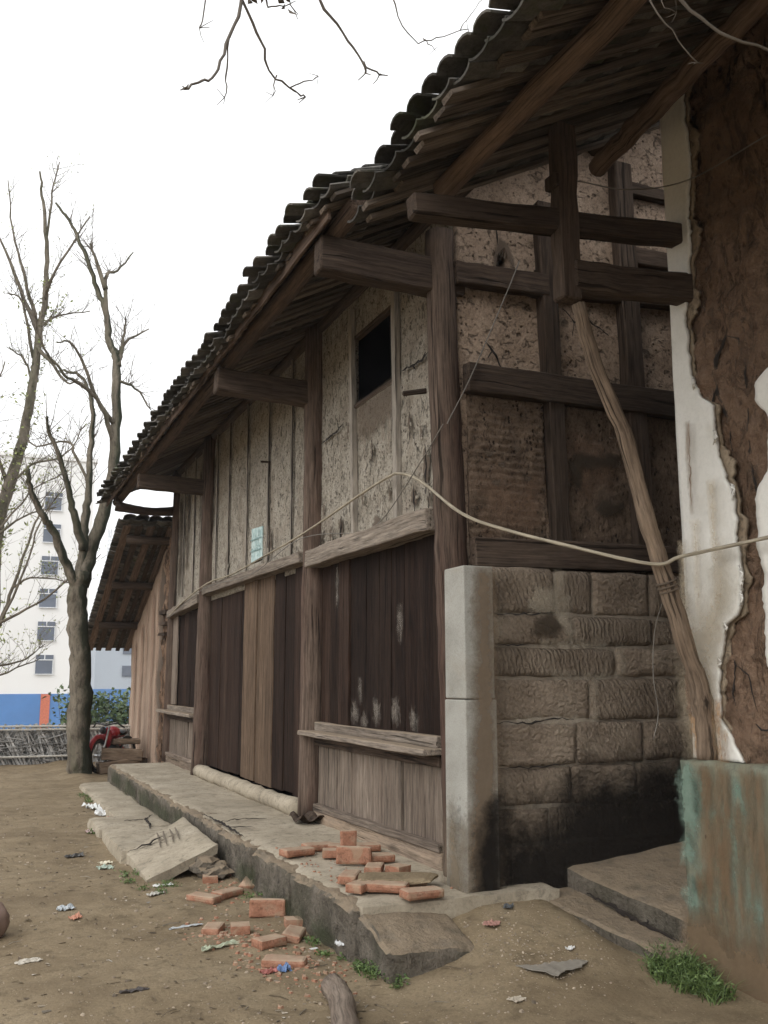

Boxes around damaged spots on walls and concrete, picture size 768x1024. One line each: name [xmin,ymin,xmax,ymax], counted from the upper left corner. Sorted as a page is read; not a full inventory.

crack [124,815,162,851]
crack [202,814,266,837]